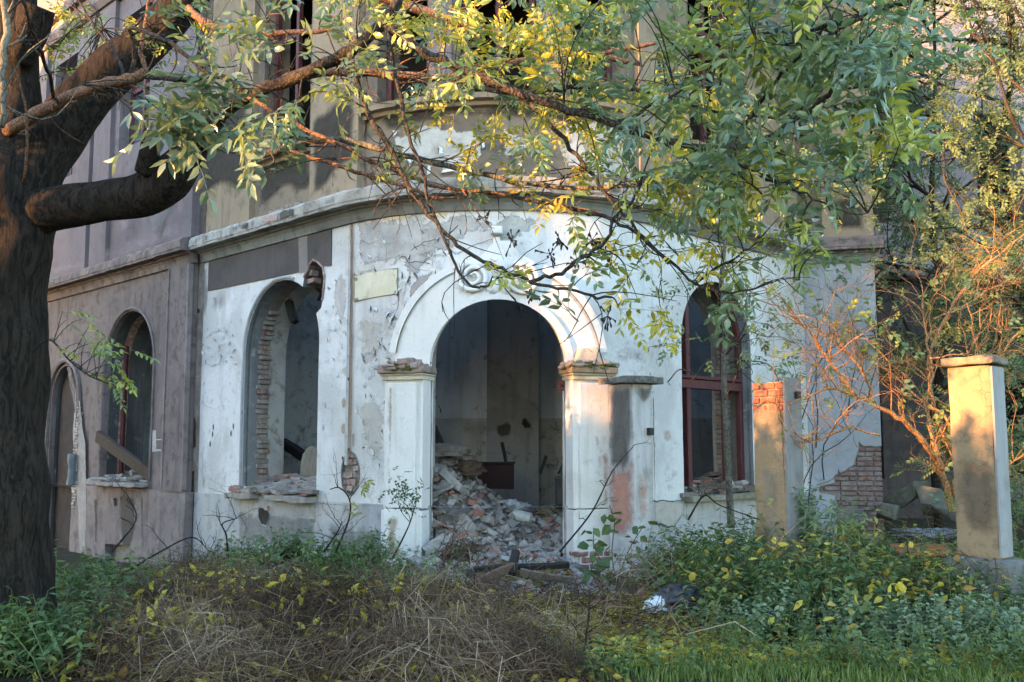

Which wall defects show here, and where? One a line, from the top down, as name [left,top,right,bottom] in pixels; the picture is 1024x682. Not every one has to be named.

peeling [303,212,535,495]
damp [604,388,651,531]
spalling [818,437,884,531]